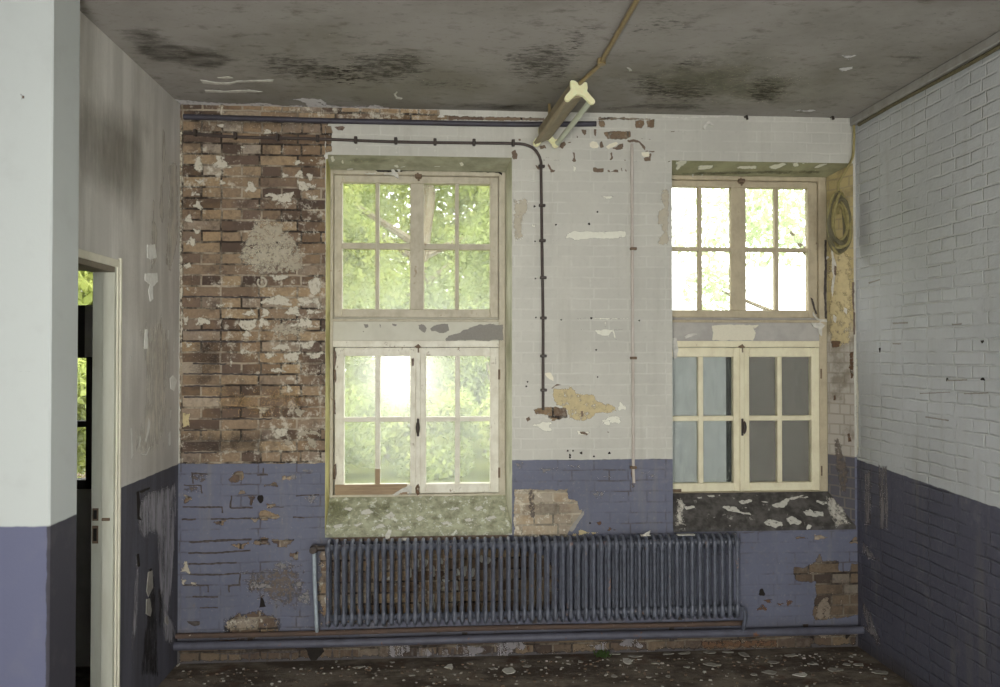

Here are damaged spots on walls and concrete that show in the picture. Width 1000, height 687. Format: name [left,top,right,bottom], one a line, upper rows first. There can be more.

water stain [264,54,429,83]
flaking render [658,190,669,244]
peeling [130,91,544,642]
flaking render [526,373,626,435]
peeling [677,495,847,540]
peeling [296,489,596,626]
spalling [793,554,878,644]
spalling [176,610,856,667]